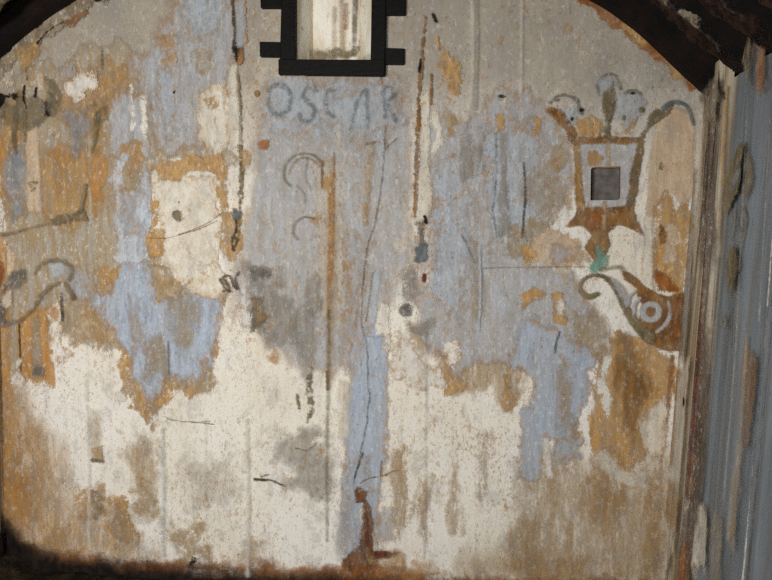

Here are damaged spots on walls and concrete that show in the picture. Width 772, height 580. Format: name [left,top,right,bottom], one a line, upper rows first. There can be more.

spalling [577,0,698,92]
leakage [0,517,342,580]
corrosion [0,389,463,580]
leakage [239,263,321,379]
peeling [0,0,611,555]
corrosion [320,153,335,350]
crack [354,348,395,483]
leakage [494,457,666,580]
peeling [509,315,690,573]
peeling [641,107,706,362]